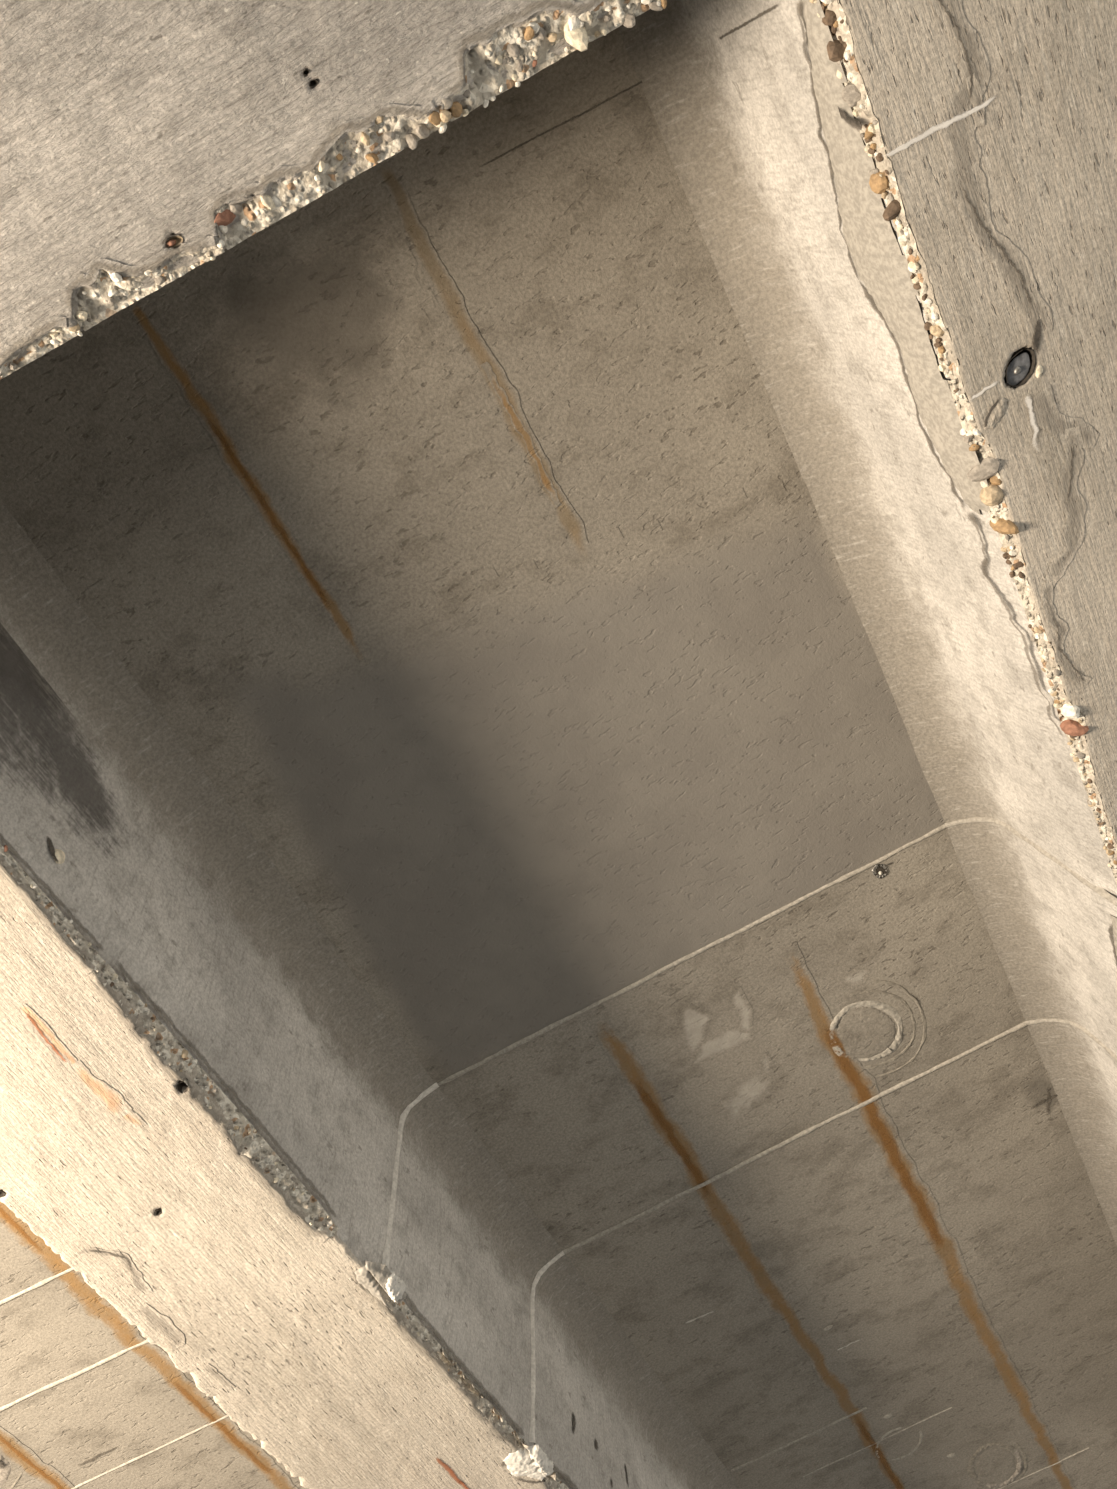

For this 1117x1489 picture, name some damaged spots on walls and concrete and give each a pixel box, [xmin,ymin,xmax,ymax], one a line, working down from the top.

rust [128,300,373,668]
spalling [0,0,667,380]
rust [374,159,599,572]
crack [482,81,642,166]
crack [719,0,1099,735]
spalling [809,0,1117,885]
damp [0,623,111,830]
spalling [0,833,338,1243]
spalling [373,1292,528,1454]
peeling [678,987,774,1125]
rust [585,1013,907,1489]
rust [778,941,1075,1489]